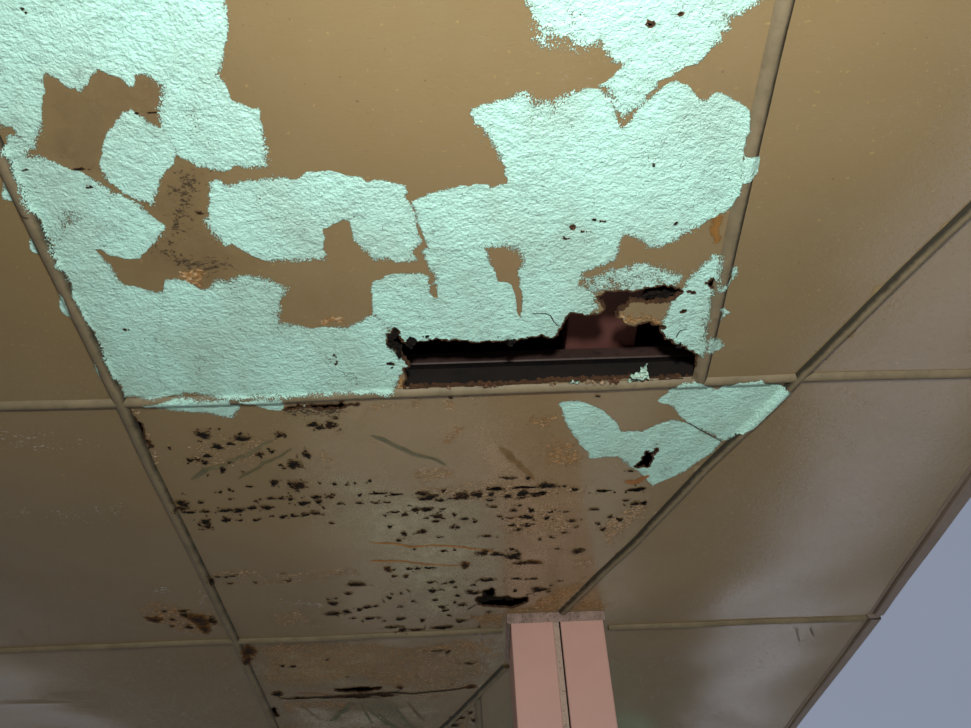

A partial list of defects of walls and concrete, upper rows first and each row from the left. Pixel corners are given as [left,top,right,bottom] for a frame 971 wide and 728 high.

peeling [637,288,677,299]
peeling [387,328,429,359]
peeling [569,363,649,385]
damp [189,397,623,687]